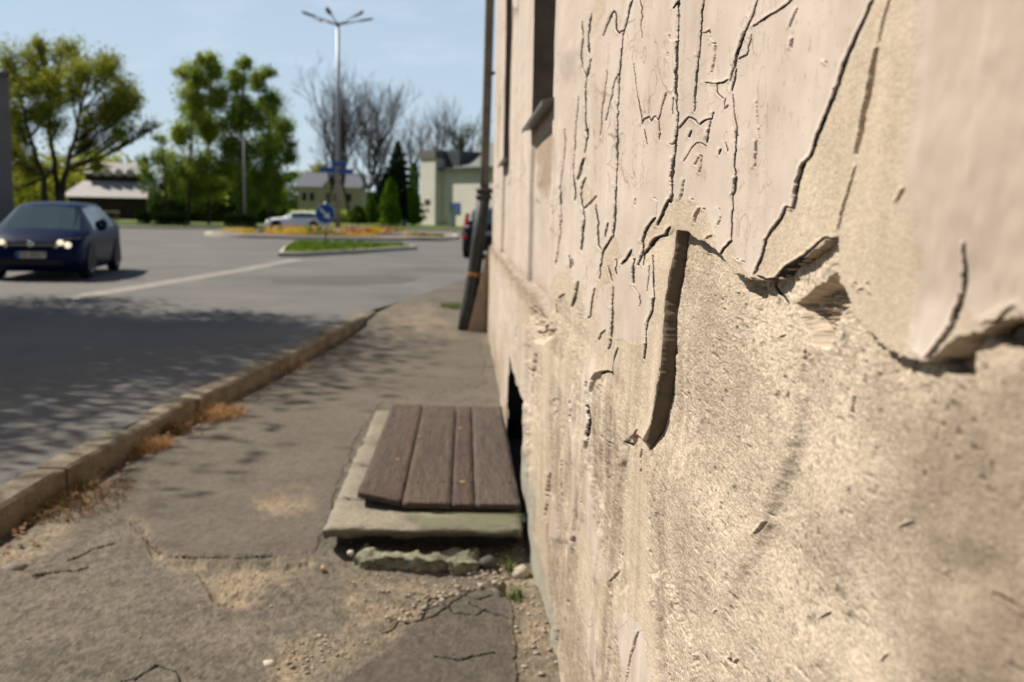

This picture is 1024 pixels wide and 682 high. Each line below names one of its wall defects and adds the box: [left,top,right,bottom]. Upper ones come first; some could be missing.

crack [555,0,792,374]
crack [753,0,874,303]
spalling [585,0,1024,682]
crack [928,243,969,359]
crack [985,305,1015,323]
crack [584,405,592,440]
crack [414,589,509,619]